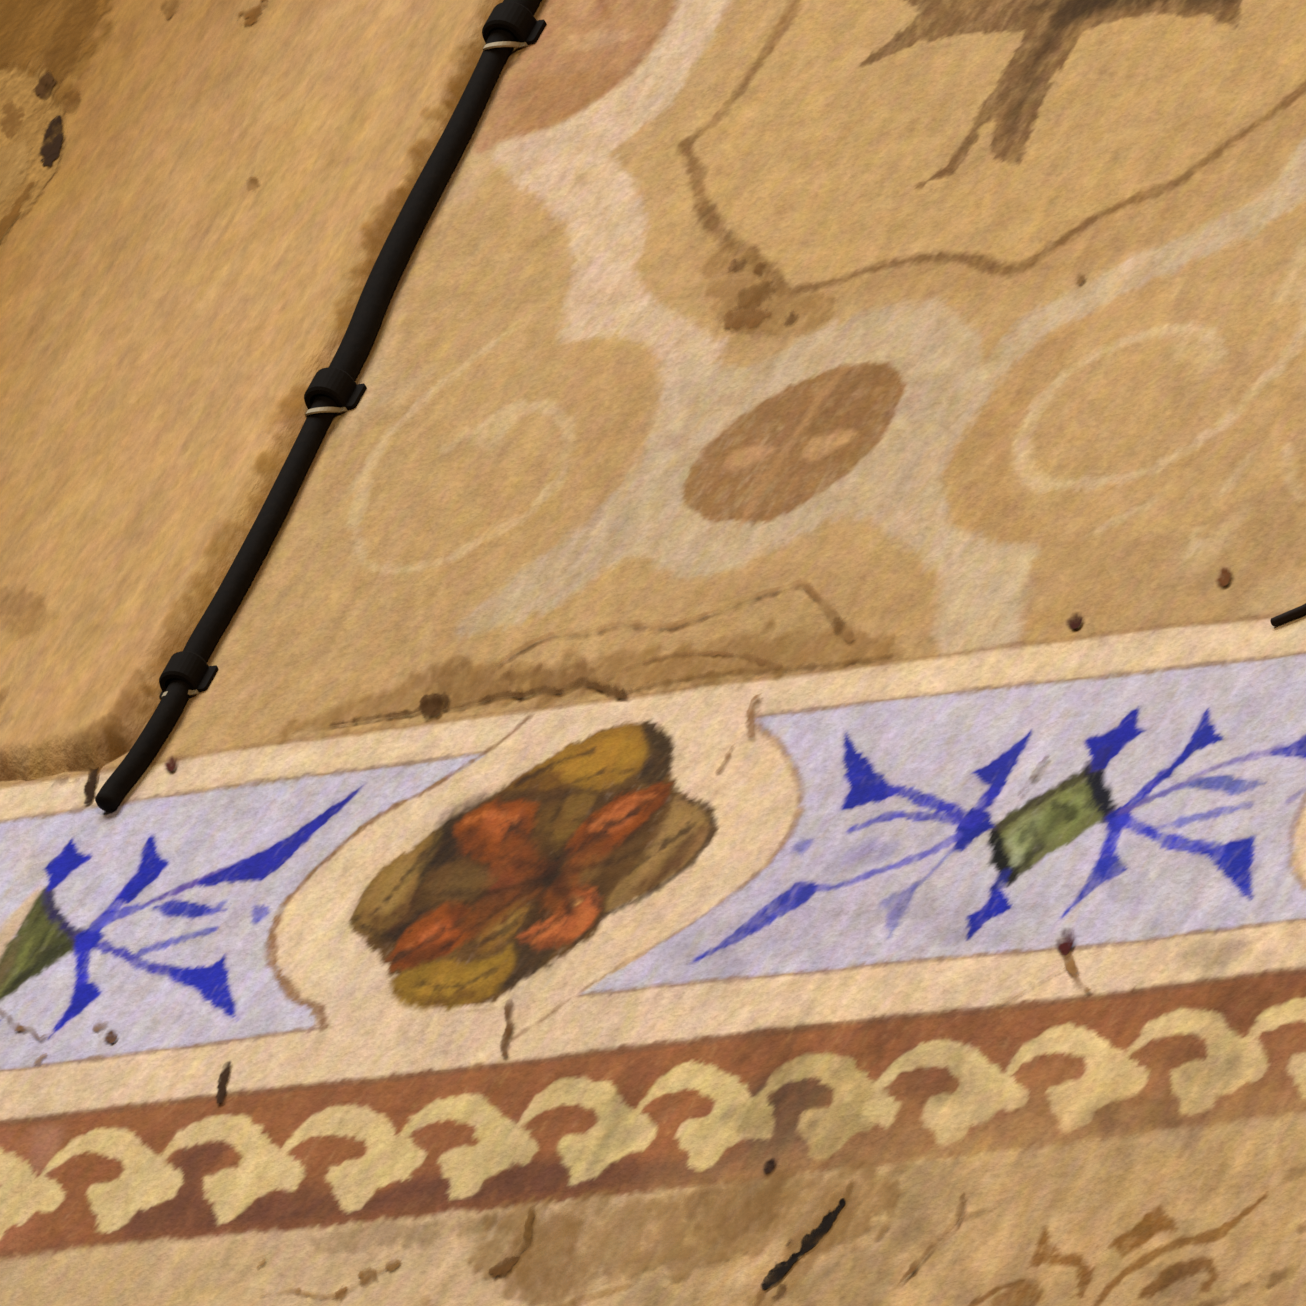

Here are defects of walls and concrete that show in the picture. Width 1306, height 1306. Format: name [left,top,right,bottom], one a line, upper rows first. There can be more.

water stain [0,0,111,107]
crack [757,1181,852,1303]